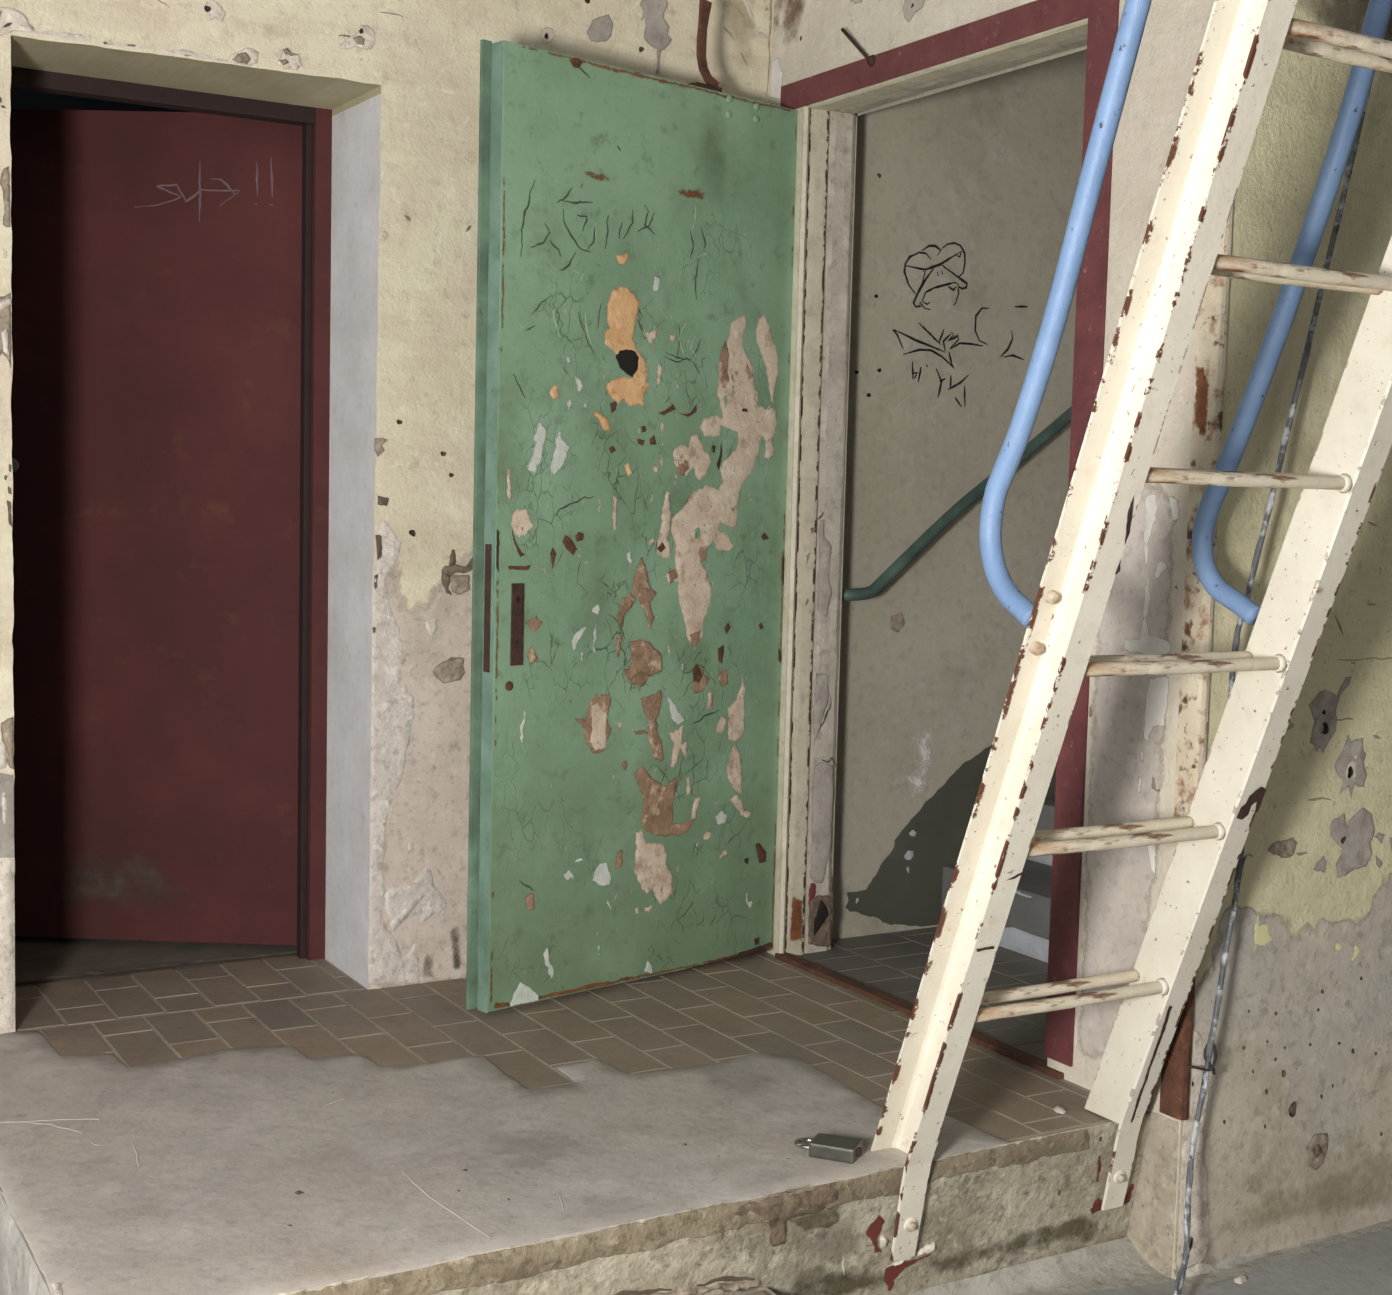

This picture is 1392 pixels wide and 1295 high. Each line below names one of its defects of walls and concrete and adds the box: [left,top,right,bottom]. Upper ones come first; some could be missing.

peeling [586,14,613,43]
peeling [634,0,672,74]
spalling [0,293,12,368]
rust [1195,368,1209,435]
spalling [374,438,387,457]
crack [1338,656,1392,664]
spalling [0,717,14,770]
flaking render [374,496,473,988]
flaking render [1124,677,1392,1278]